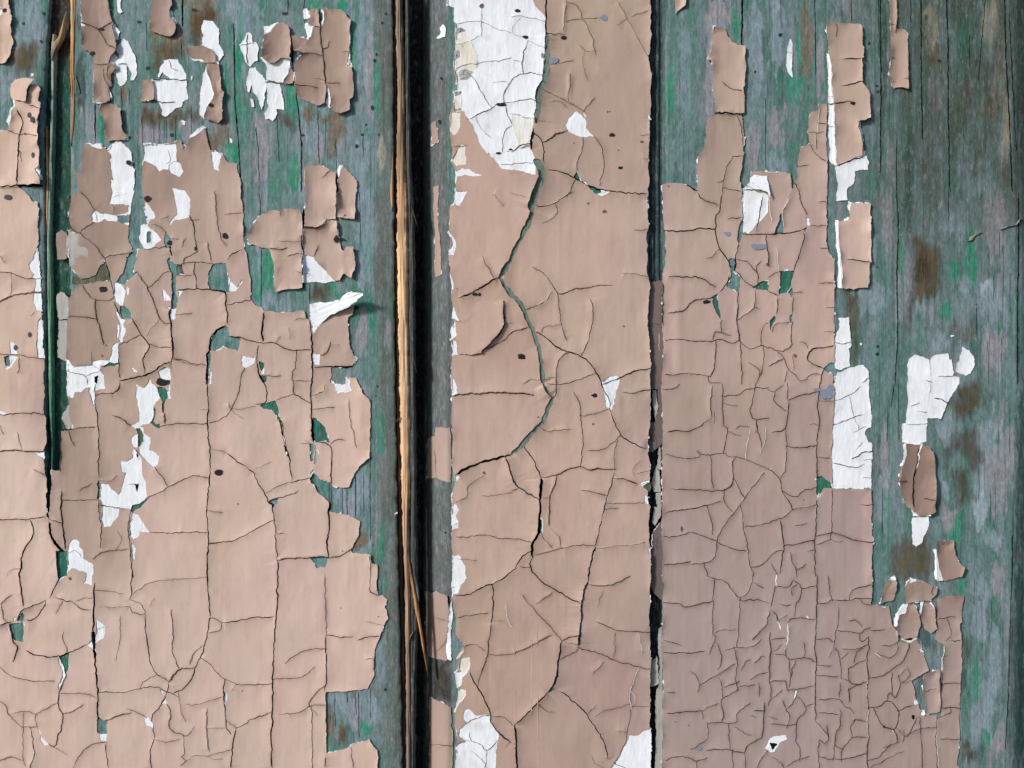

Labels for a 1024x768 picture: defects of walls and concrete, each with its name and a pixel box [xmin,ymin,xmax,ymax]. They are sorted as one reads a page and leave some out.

peeling [0,73,43,187]
peeling [29,0,224,429]
peeling [97,367,171,561]
crack [0,192,379,768]
peeling [239,7,354,121]
peeling [247,165,357,292]
peeling [310,291,363,336]
peeling [431,0,546,206]
crack [453,0,961,768]
peeling [814,317,873,499]
peeling [825,22,872,290]
peeling [897,347,975,546]